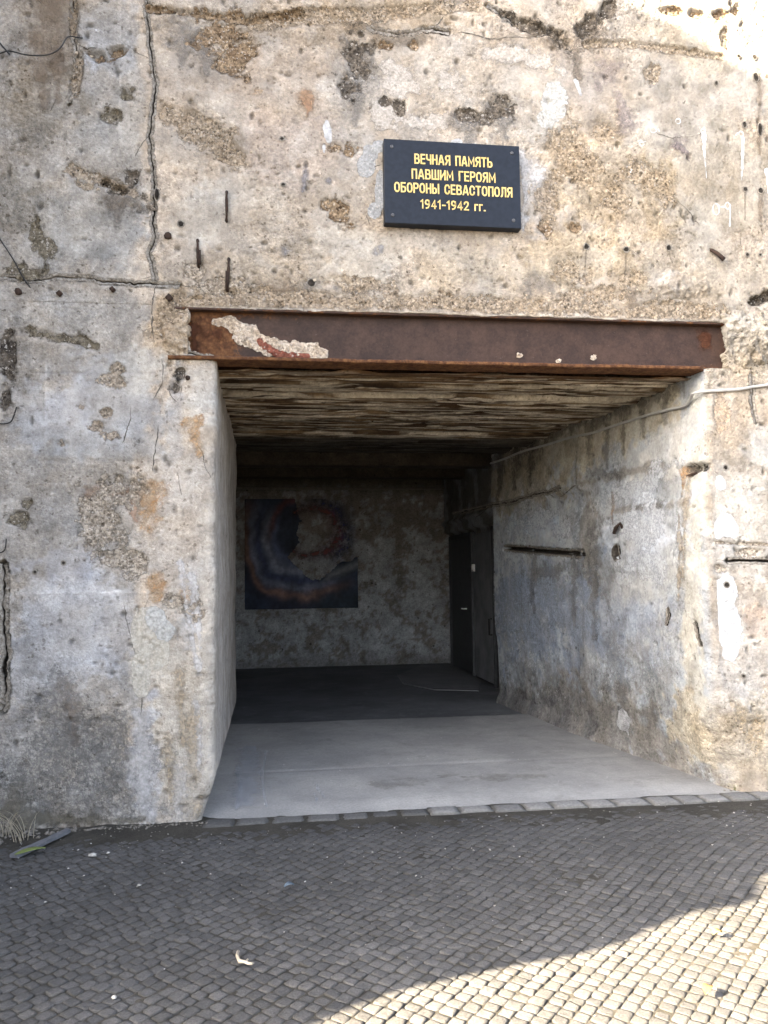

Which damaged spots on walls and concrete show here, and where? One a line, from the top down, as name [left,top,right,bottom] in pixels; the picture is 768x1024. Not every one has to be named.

spalling [145,0,479,118]
crack [0,0,198,340]
spalling [152,100,257,173]
spalling [454,94,517,126]
spalling [320,193,357,231]
rust [188,321,223,352]
spalling [137,257,731,339]
spalling [68,473,150,582]
crack [0,564,14,712]